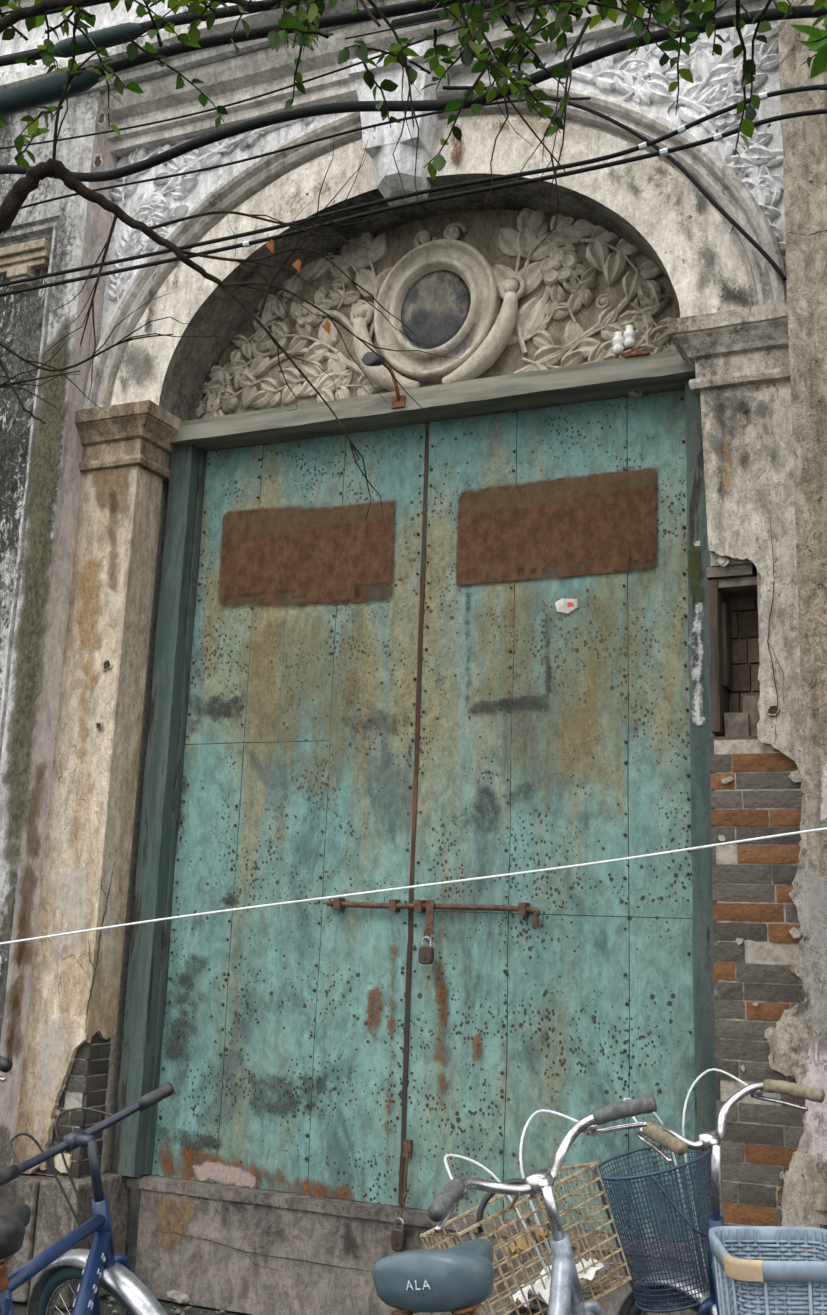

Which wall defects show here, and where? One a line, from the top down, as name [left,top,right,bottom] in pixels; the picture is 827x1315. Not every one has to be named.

leakage [0,297,44,512]
leakage [77,468,127,757]
corrosion [219,500,395,606]
corrosion [456,468,657,586]
leakage [7,765,45,1075]
spalling [686,541,827,1226]
spalling [26,1032,111,1178]
corrosion [366,941,396,1166]
corrosion [433,961,447,1105]
corrosion [472,1032,482,1061]